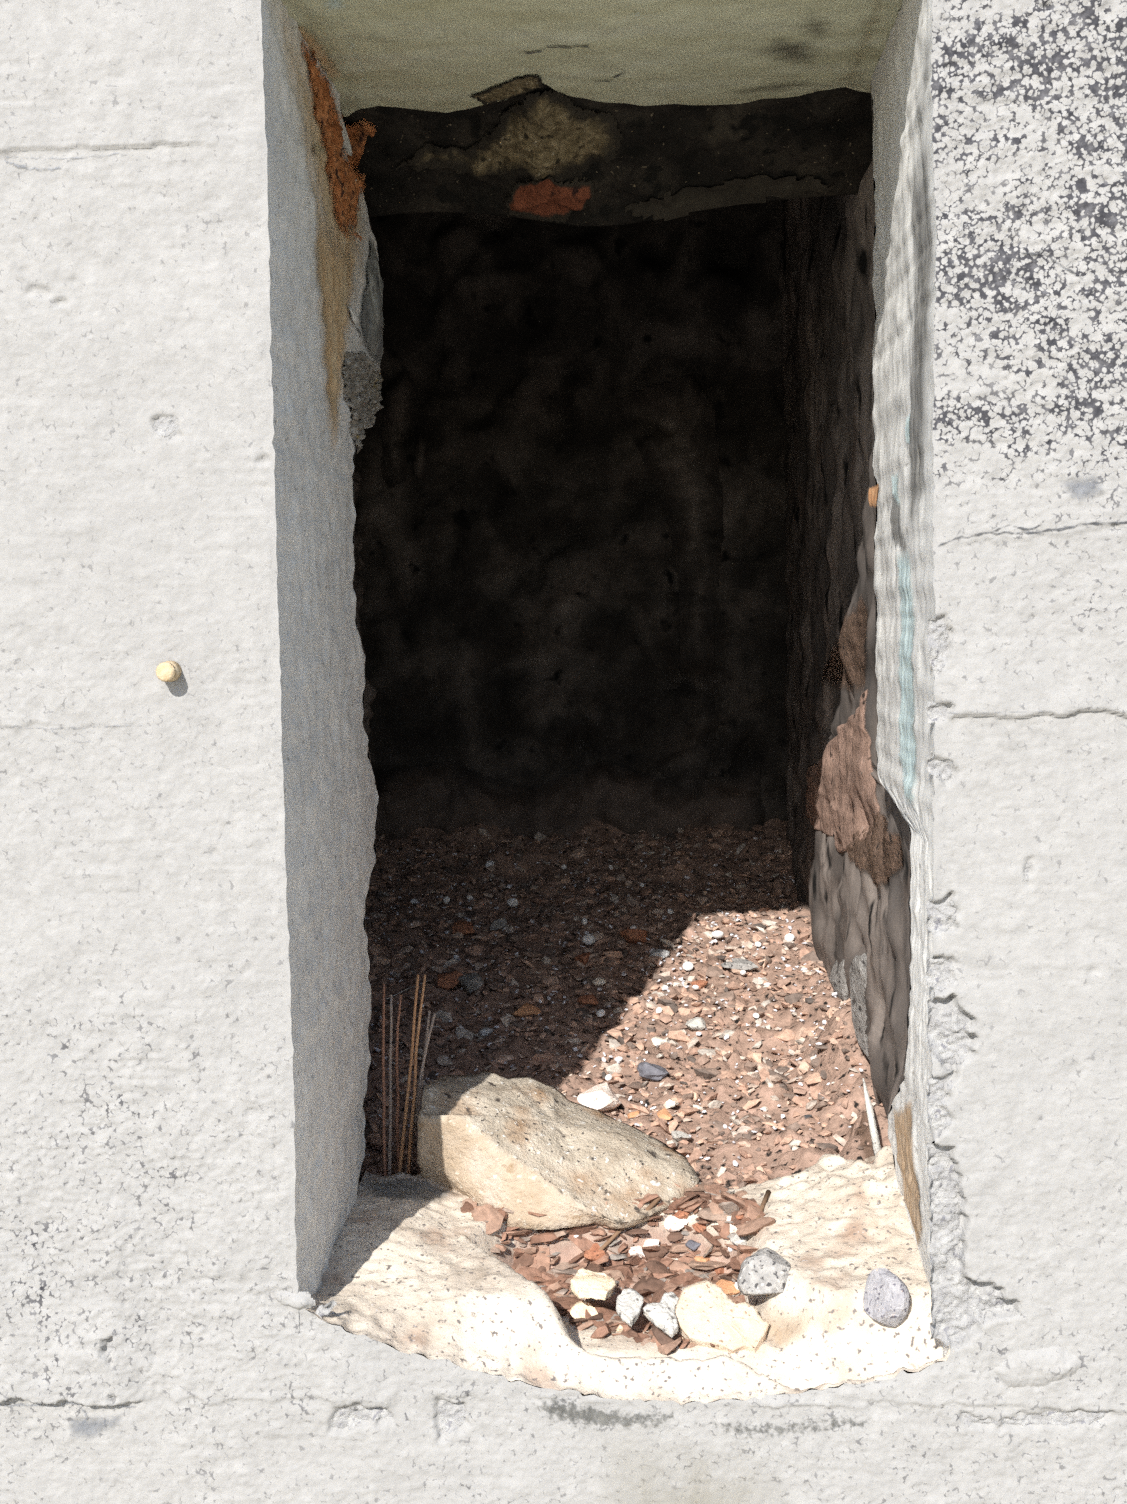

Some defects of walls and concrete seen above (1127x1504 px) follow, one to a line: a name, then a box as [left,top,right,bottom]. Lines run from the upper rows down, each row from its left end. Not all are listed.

rust [298,28,365,429]
spalling [926,896,957,933]
spalling [926,956,1022,1345]